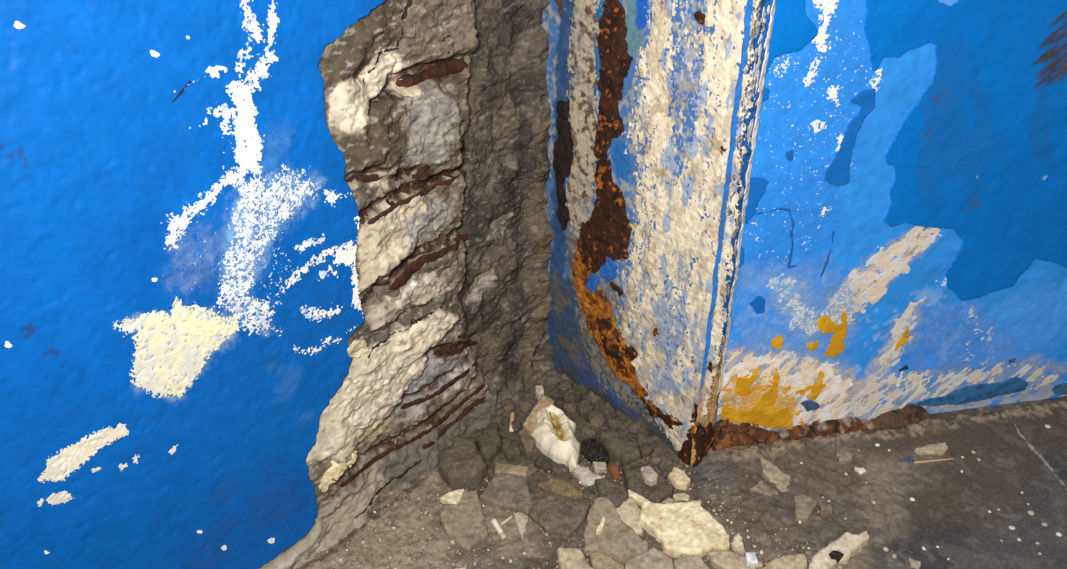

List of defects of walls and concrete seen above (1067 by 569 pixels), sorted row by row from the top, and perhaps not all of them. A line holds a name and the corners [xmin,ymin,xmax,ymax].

peeling [37,423,129,507]
spalling [113,0,556,569]
rust [553,0,930,467]
peeling [564,0,1067,451]
crack [1014,424,1067,490]
rust [1037,12,1067,82]